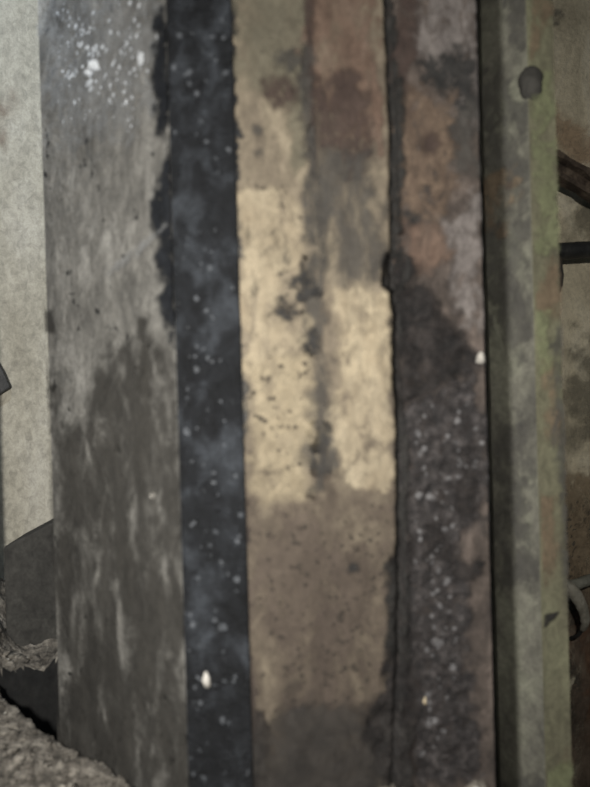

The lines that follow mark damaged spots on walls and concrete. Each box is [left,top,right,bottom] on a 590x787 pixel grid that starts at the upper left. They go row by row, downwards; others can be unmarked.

damp [231,0,388,355]
damp [413,0,529,204]
damp [245,366,396,759]